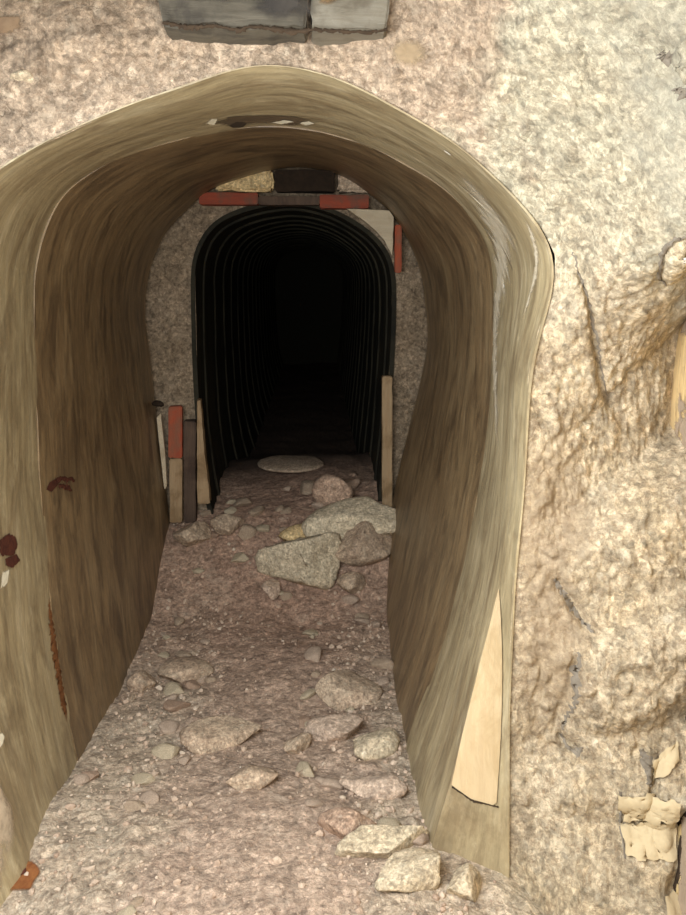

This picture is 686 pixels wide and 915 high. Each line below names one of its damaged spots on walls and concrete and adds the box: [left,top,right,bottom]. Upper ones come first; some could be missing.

rust [47,476,75,492]
rust [0,533,20,588]
rust [48,602,67,720]
rust [10,861,40,890]